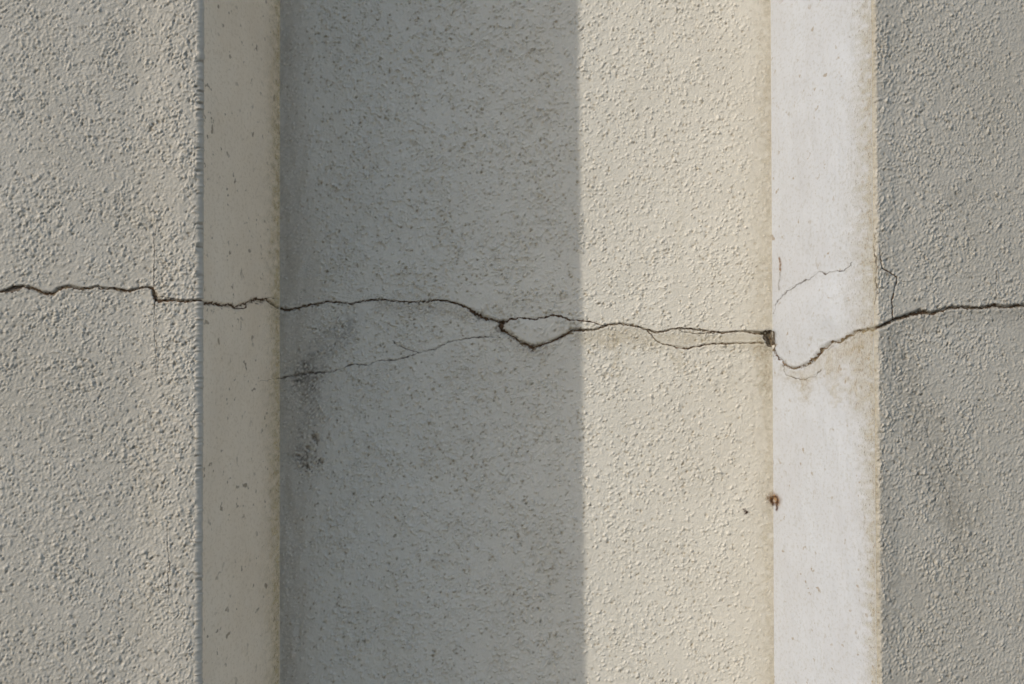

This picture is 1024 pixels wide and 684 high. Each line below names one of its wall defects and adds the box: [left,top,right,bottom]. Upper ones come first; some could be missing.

crack [0,235,1024,380]